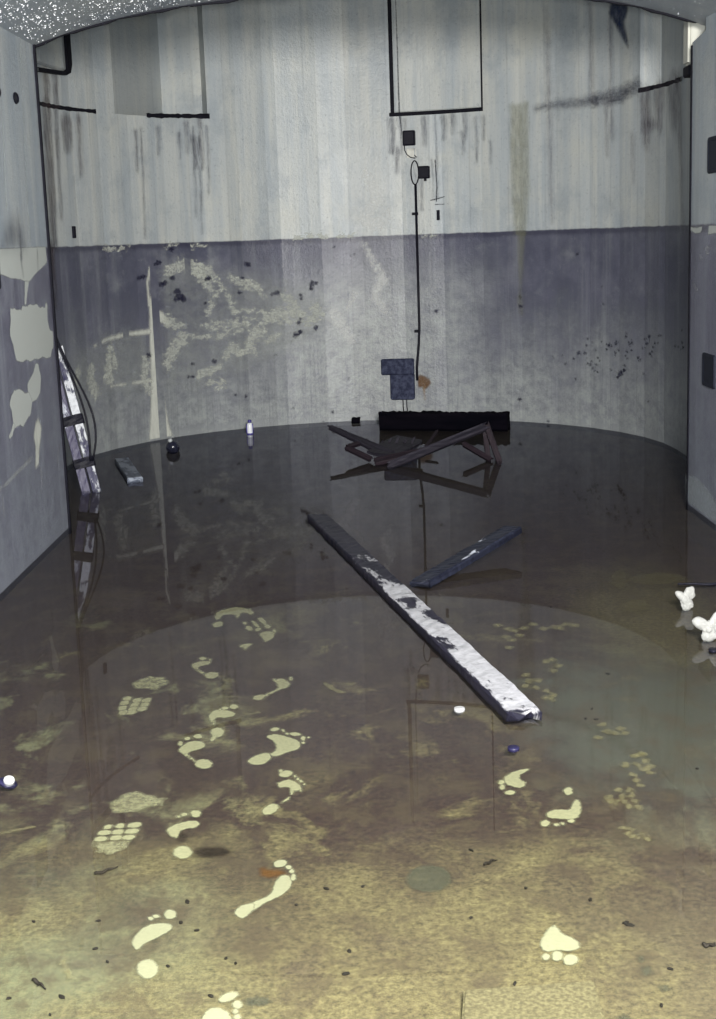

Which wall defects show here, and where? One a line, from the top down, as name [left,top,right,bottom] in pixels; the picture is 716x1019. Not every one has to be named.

peeling [0,246,53,438]
peeling [74,345,117,402]
peeling [163,259,325,391]
rust [418,376,430,388]